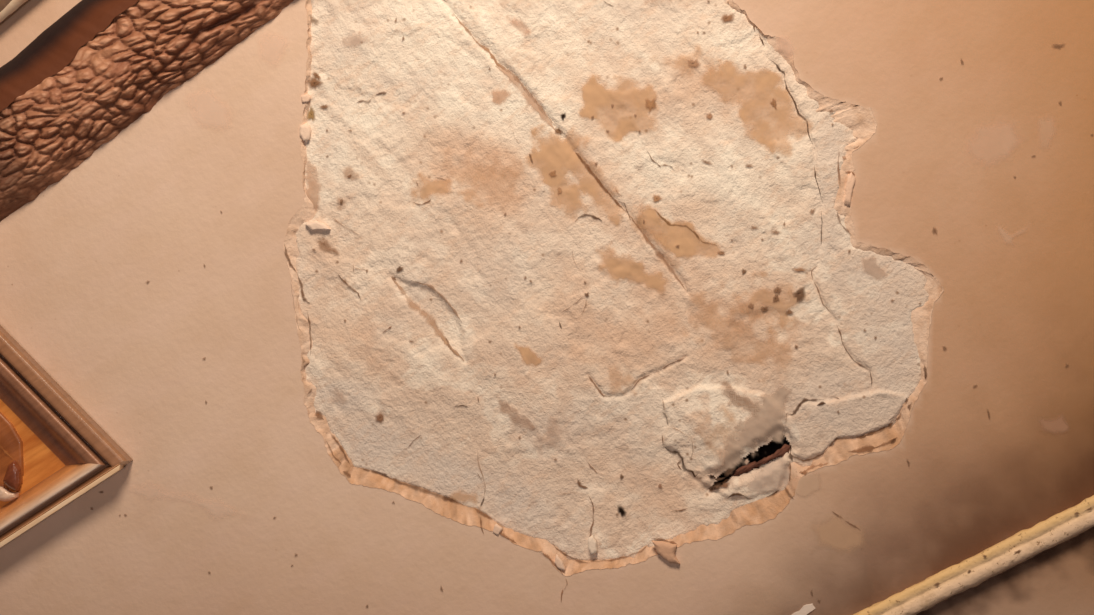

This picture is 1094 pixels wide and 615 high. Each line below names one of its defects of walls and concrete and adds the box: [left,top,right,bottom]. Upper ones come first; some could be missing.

crack [444,0,556,131]
water stain [580,76,655,141]
water stain [704,62,795,152]
water stain [528,130,619,225]
crack [575,152,722,291]
spalling [283,0,944,576]
water stain [600,256,665,291]
crack [728,415,900,499]